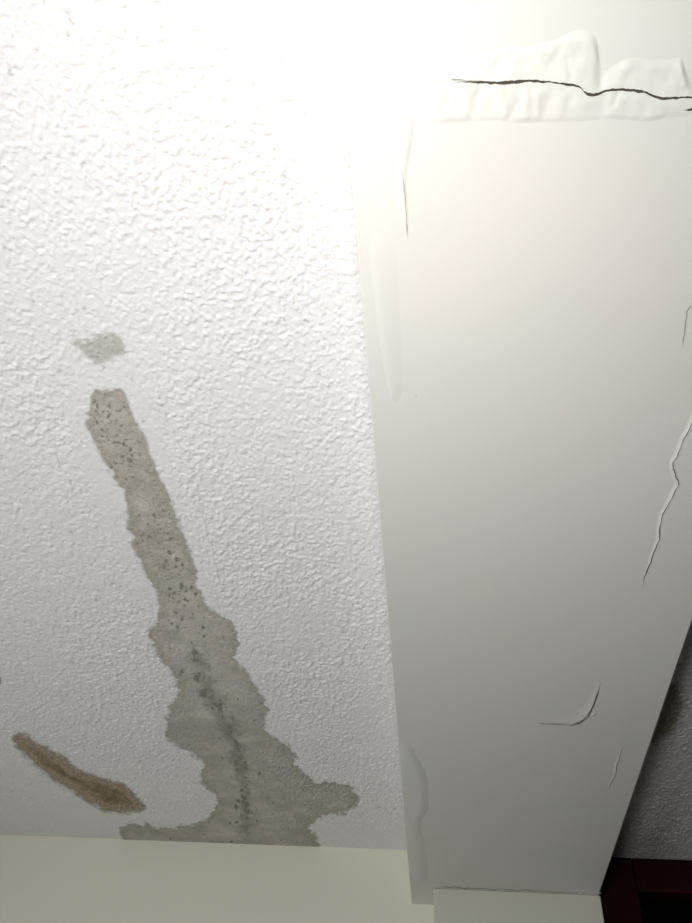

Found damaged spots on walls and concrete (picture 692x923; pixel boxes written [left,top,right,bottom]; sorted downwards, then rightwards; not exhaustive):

crack [643,411,692,586]
damp [86,389,359,847]
crack [539,687,600,726]
damp [652,685,681,742]